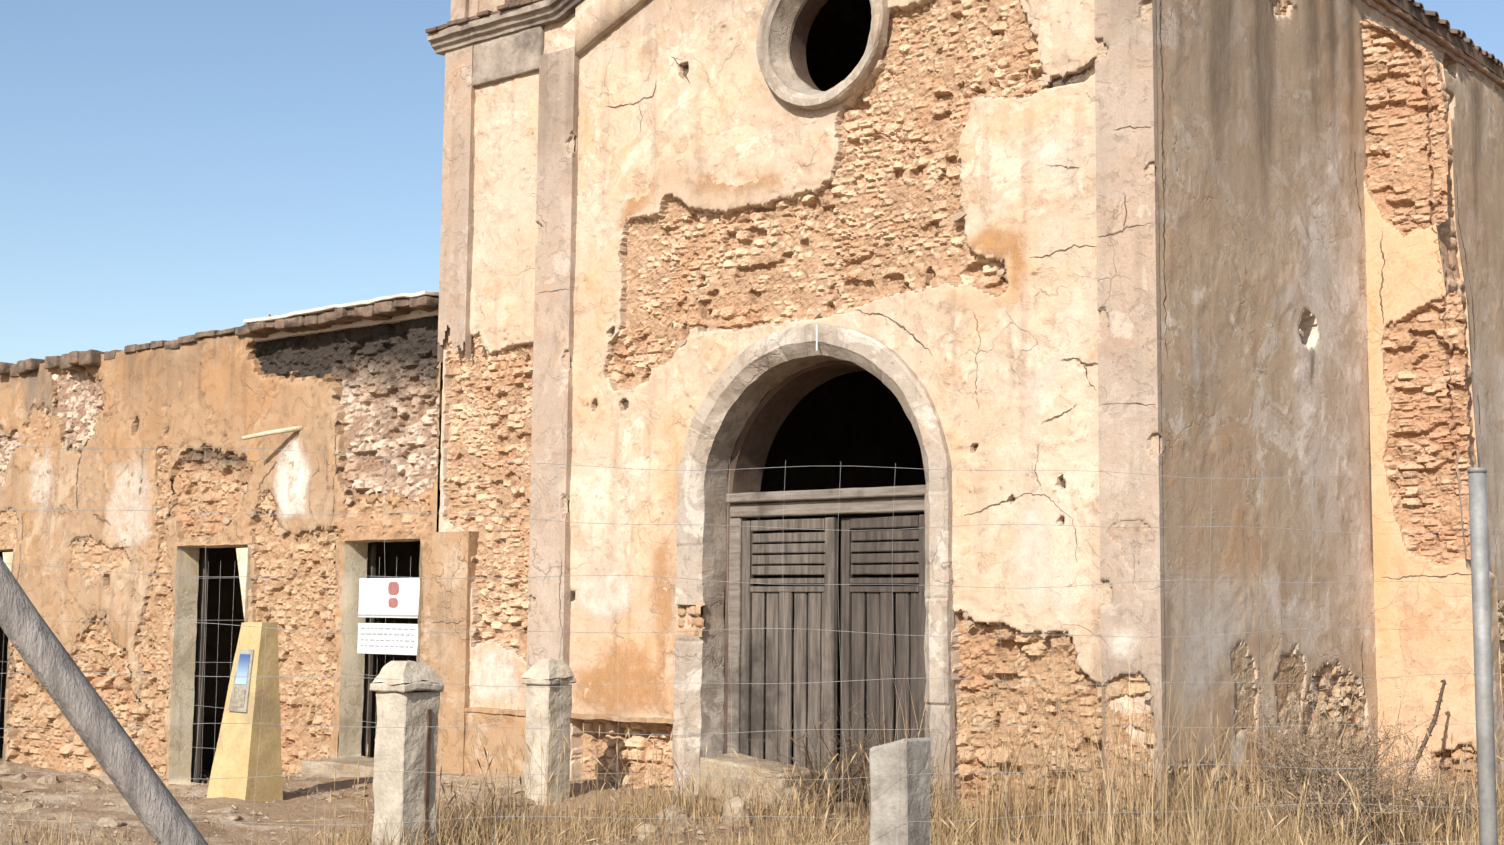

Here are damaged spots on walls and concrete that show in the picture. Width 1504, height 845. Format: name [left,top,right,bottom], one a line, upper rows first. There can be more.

leakage [1255,0,1272,137]
flaking render [1270,0,1297,17]
flaking render [607,0,1068,410]
flaking render [1362,19,1477,565]
flaking render [0,508,18,548]
flaking render [0,370,104,489]
flaking render [72,312,536,784]
crack [964,357,1149,560]
flaking render [9,647,106,777]
flaking render [955,612,1375,829]